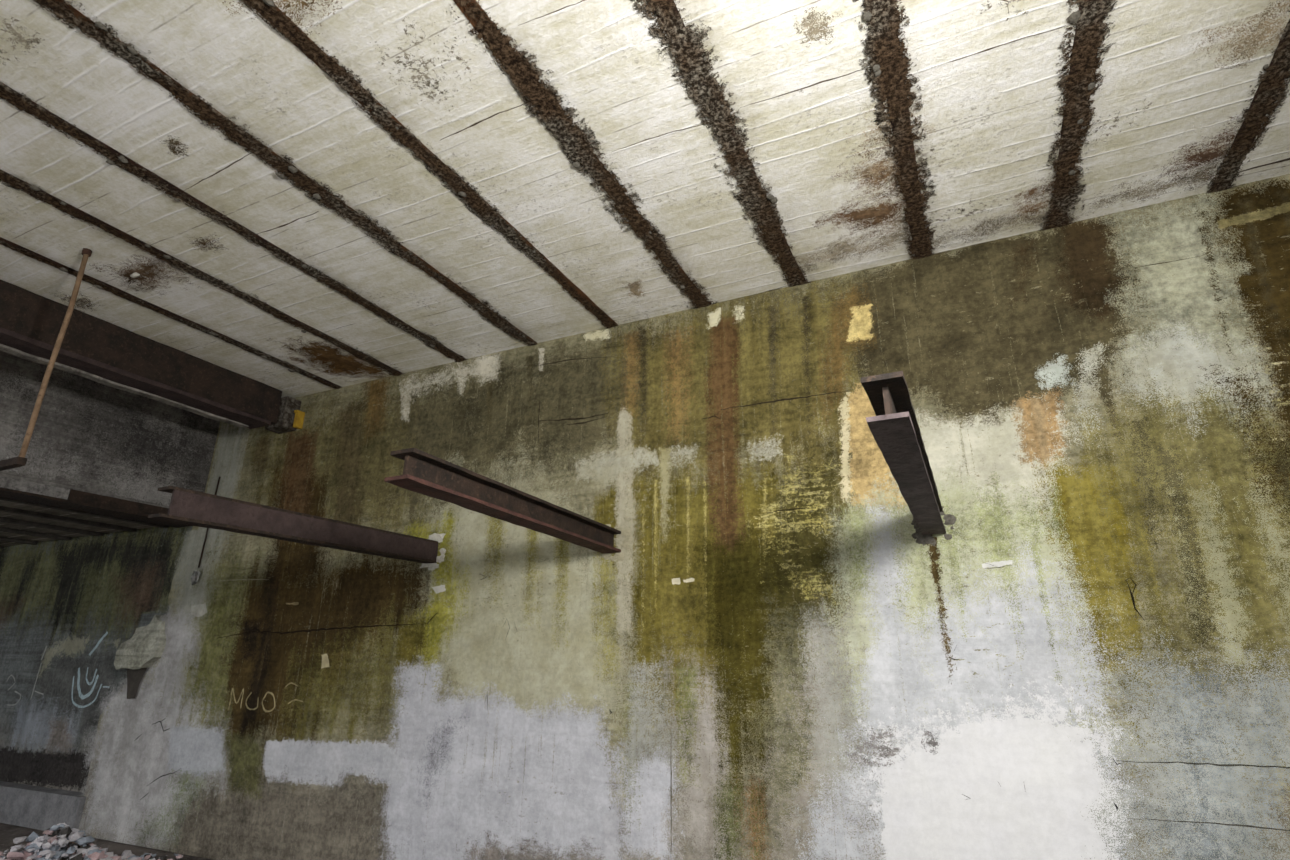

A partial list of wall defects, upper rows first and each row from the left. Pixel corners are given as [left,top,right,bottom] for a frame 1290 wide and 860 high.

spalling [0,0,537,389]
spalling [239,0,619,329]
spalling [445,0,719,309]
spalling [632,0,811,287]
spalling [855,0,938,259]
spalling [1039,0,1118,231]
spalling [1206,4,1290,193]
rust [267,336,398,382]
leakage [0,176,1290,860]
rust [926,536,957,684]